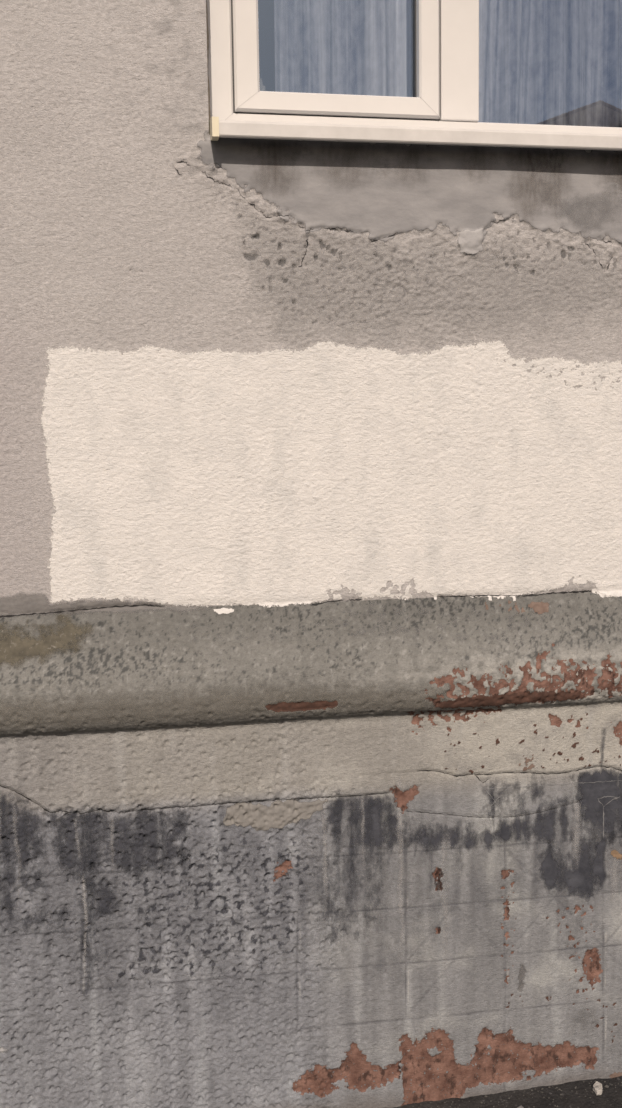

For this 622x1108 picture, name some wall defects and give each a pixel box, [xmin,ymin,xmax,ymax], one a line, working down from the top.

spalling [252,228,353,304]
peeling [265,700,338,712]
peeling [407,642,622,774]
crack [0,785,387,814]
water stain [324,745,622,897]
crack [419,766,622,783]
water stain [0,799,309,978]
peeling [501,869,526,1008]
peeling [546,904,617,1043]
peeling [292,1027,599,1106]